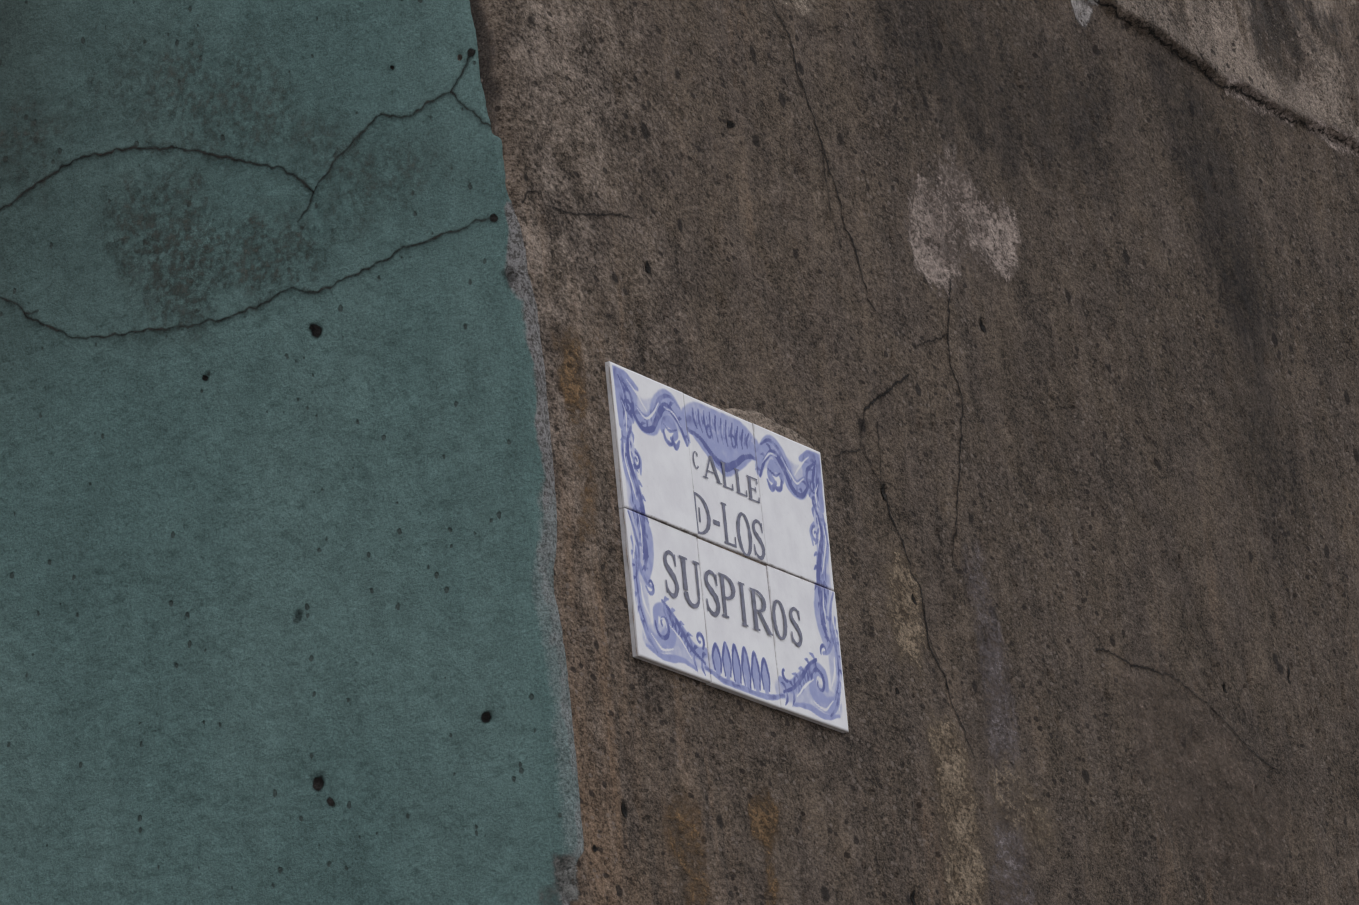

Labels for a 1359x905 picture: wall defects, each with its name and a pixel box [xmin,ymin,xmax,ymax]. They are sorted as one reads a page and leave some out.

crack [0,56,492,223]
crack [521,190,632,226]
crack [0,218,490,339]